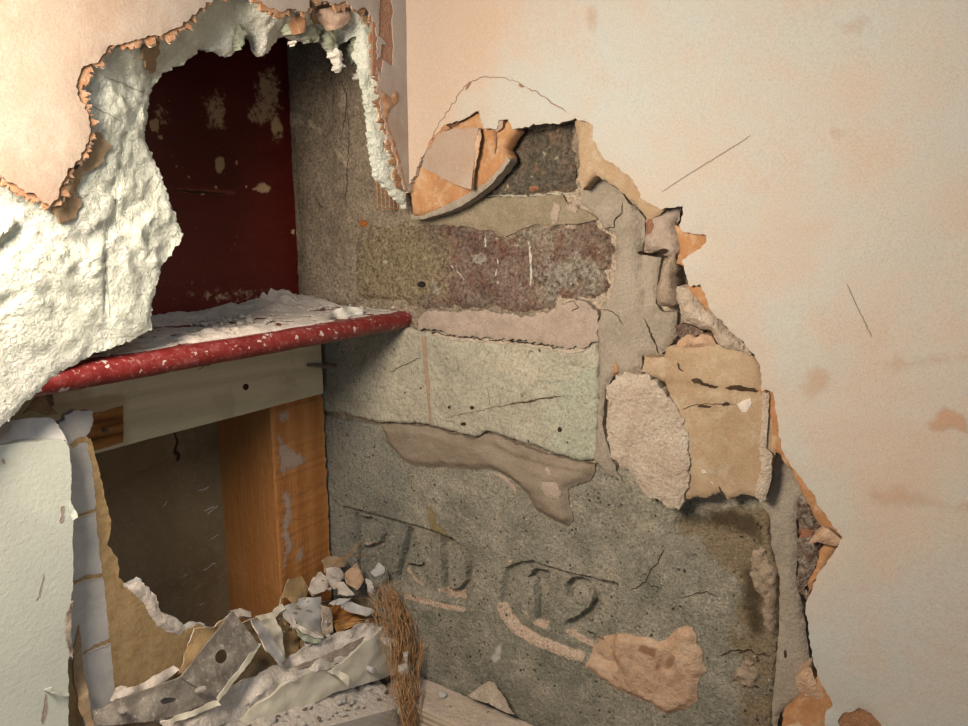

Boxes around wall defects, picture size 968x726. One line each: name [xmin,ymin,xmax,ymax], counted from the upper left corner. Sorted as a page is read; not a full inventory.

flaking render [371,0,393,77]
crack [431,76,567,140]
peeling [380,90,525,219]
peeling [574,119,671,220]
crack [665,136,749,190]
peeling [675,225,706,266]
peeling [685,284,713,313]
flaking render [606,344,840,596]
flaking render [398,651,409,677]
peeling [468,681,514,714]
peeling [782,657,833,726]
flaking render [838,708,881,726]